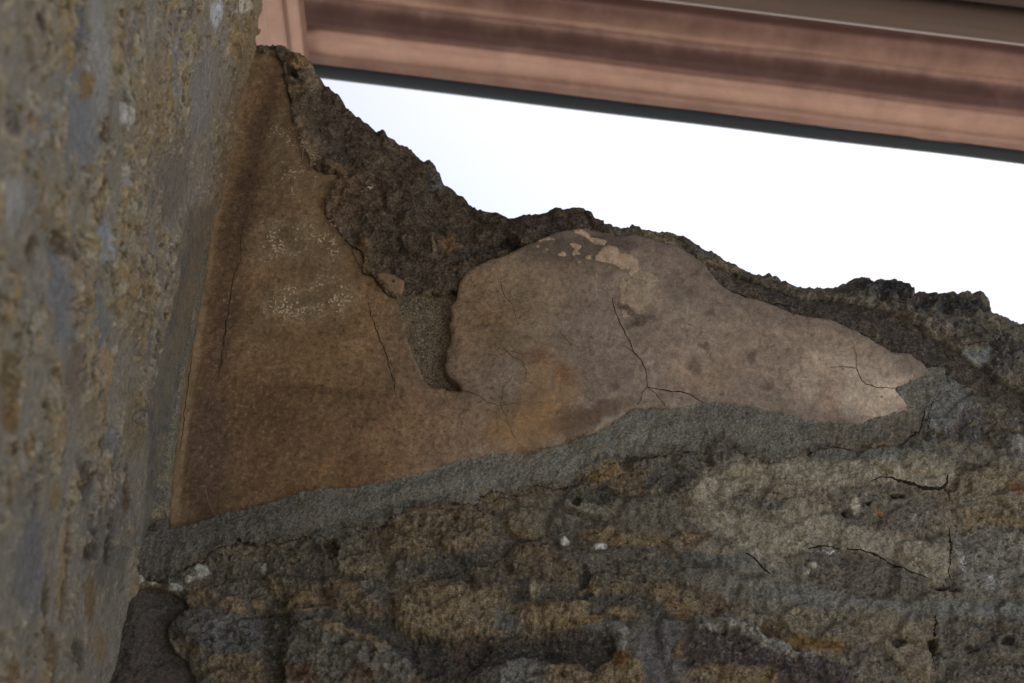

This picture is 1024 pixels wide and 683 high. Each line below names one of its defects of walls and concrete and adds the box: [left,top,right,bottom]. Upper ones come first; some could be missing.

spalling [283,52,659,391]
crack [368,303,396,394]
crack [612,297,704,406]
spalling [706,263,1024,412]
crack [839,348,896,389]
crack [901,391,941,446]
crack [872,474,951,500]
crack [808,528,953,579]